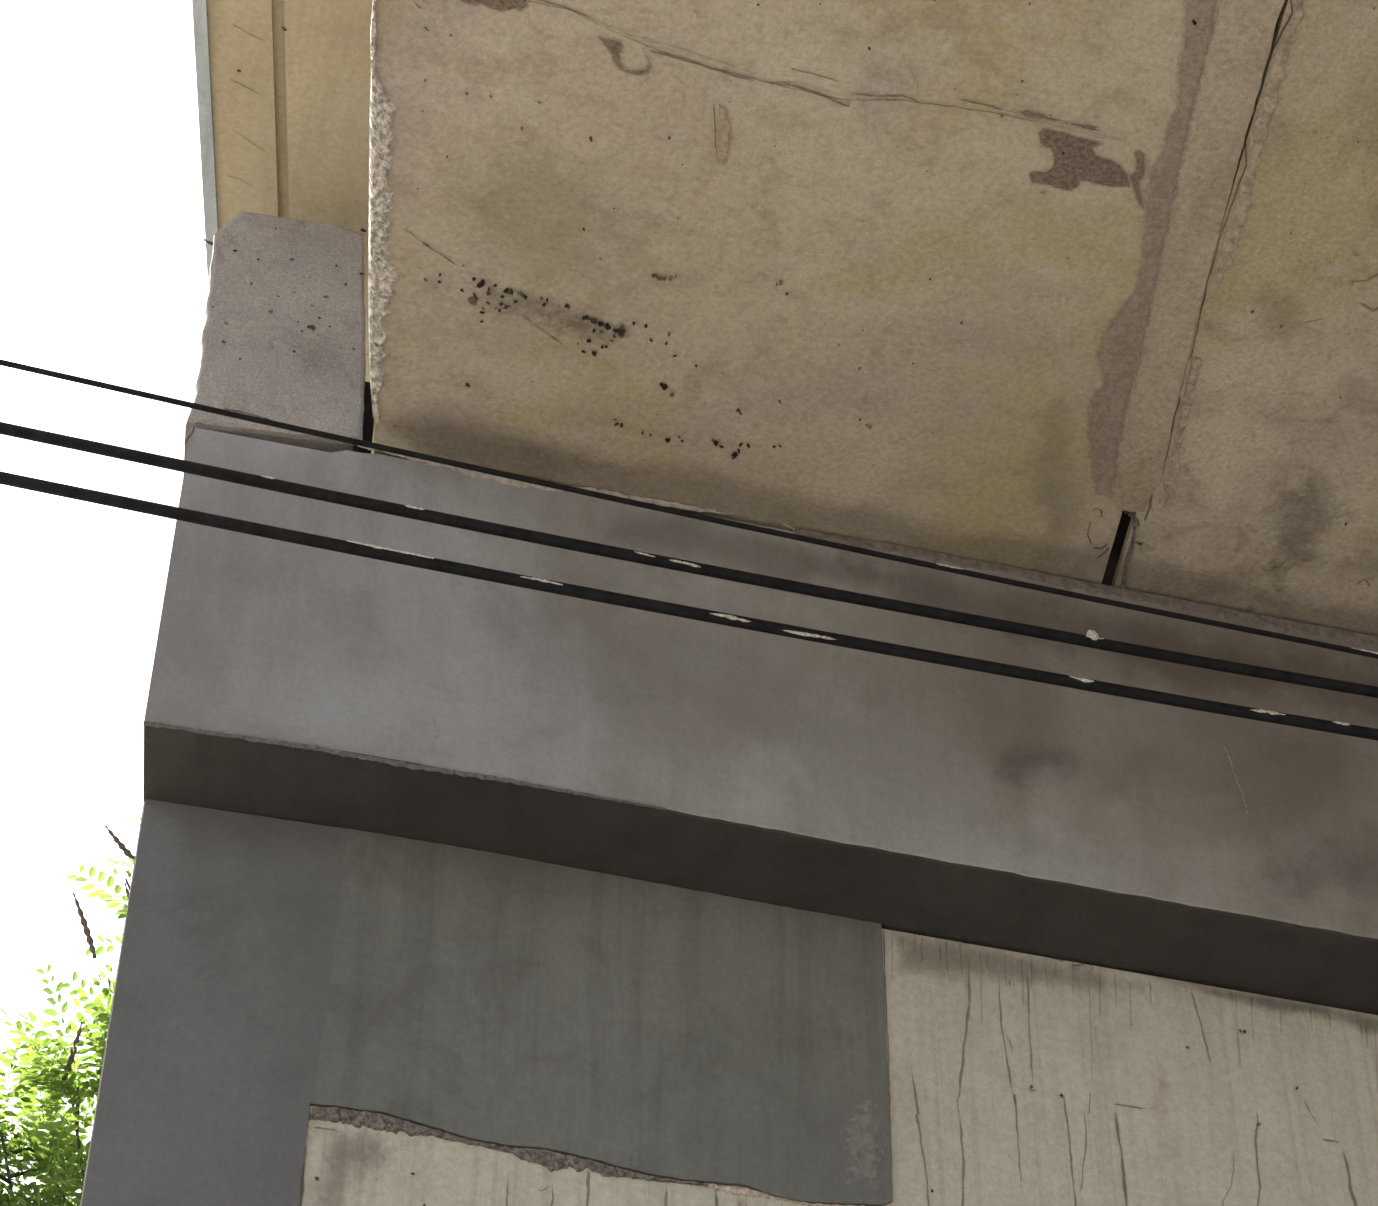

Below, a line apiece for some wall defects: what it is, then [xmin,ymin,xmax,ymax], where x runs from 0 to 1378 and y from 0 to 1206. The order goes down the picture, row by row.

crack [525,0,1097,133]
spalling [344,0,401,423]
leakage [1088,0,1216,495]
crack [1087,0,1293,558]
crack [376,1112,775,1206]
spalling [309,1106,865,1206]
crack [1064,1094,1139,1206]
crack [1254,1121,1262,1204]